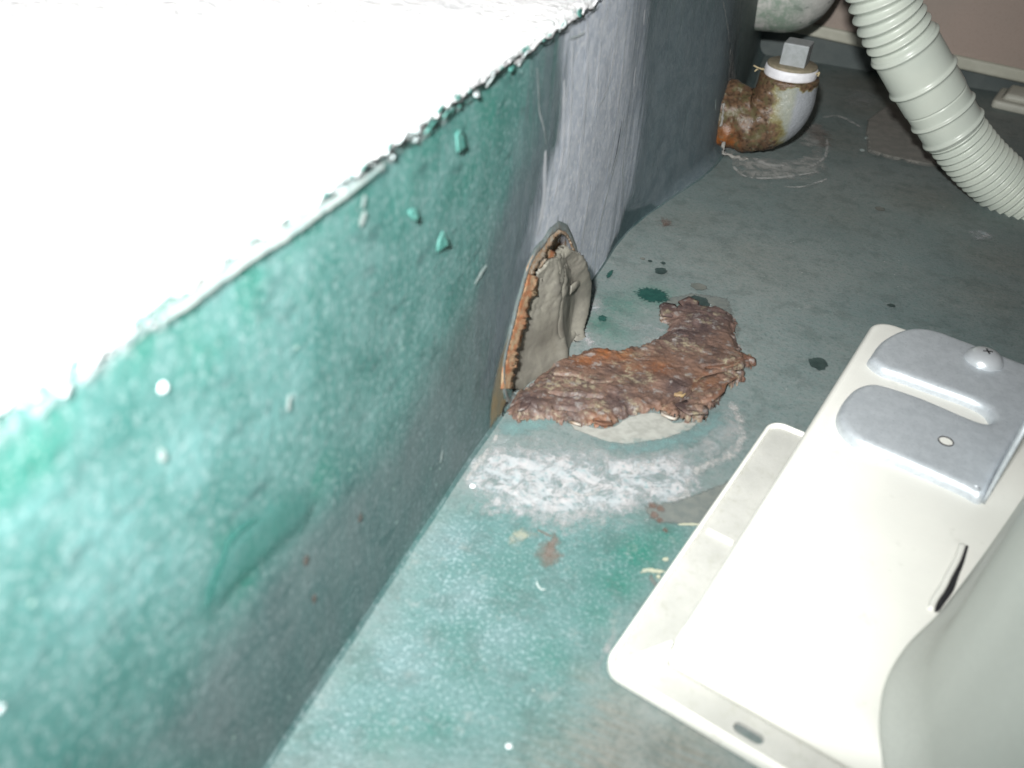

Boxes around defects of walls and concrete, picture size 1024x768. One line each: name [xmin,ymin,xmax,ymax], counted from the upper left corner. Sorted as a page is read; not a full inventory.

spalling [501,230,576,389]
corrosion [491,296,757,428]
leakage [466,405,745,523]